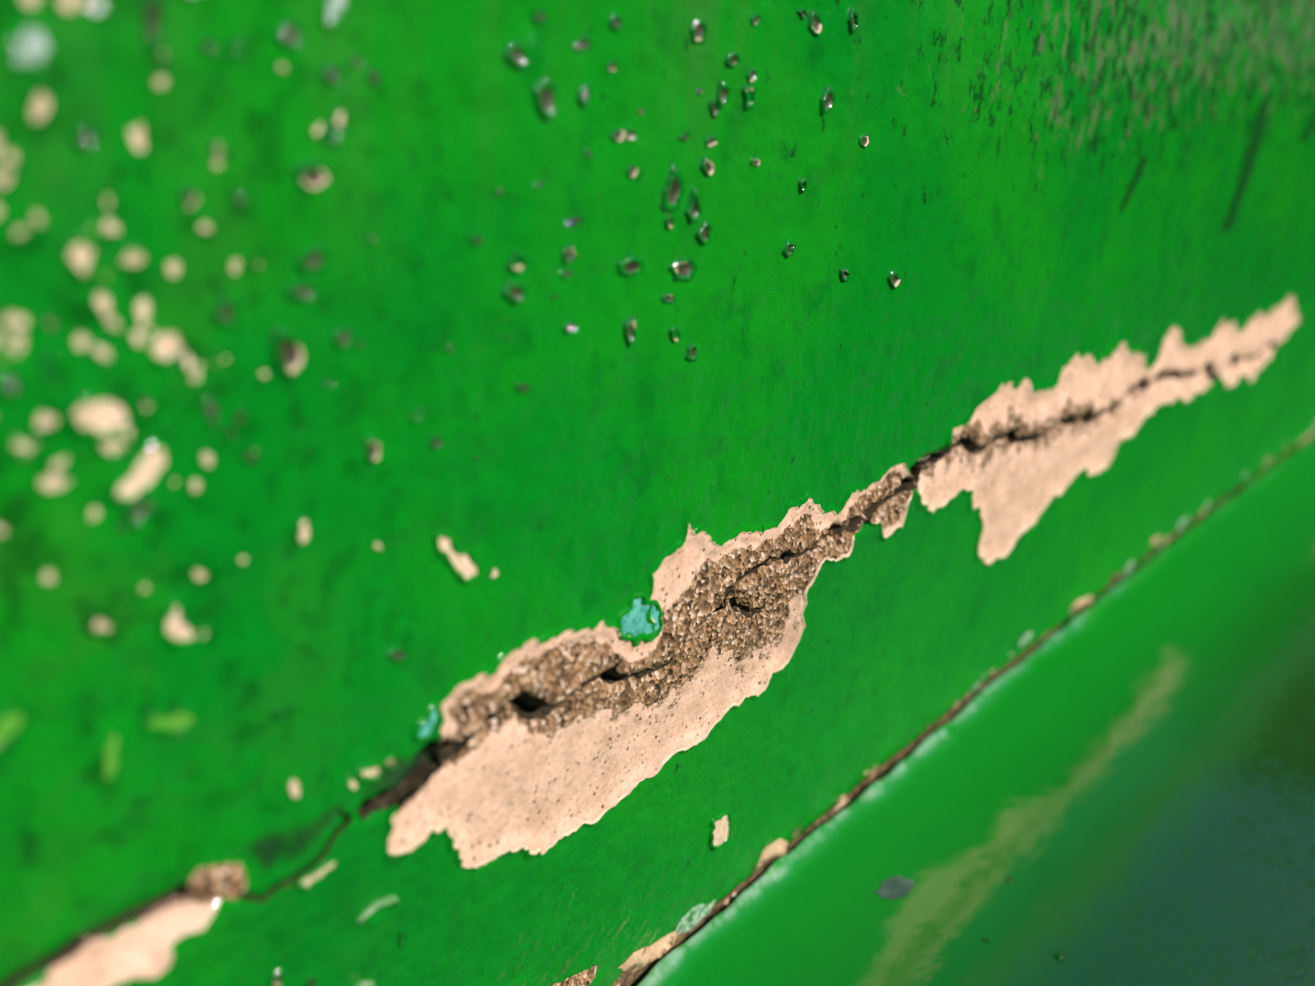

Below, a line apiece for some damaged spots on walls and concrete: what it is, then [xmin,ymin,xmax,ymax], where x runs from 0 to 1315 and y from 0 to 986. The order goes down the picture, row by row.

peeling [5,0,92,126]
spalling [659,131,718,304]
peeling [0,217,207,403]
spalling [258,325,307,382]
peeling [4,386,215,529]
crack [696,310,1315,632]
peeling [158,597,209,648]
spalling [382,287,1300,872]
crack [622,435,1313,986]
spalling [28,891,219,986]
crack [0,661,672,986]
spalling [612,827,801,986]